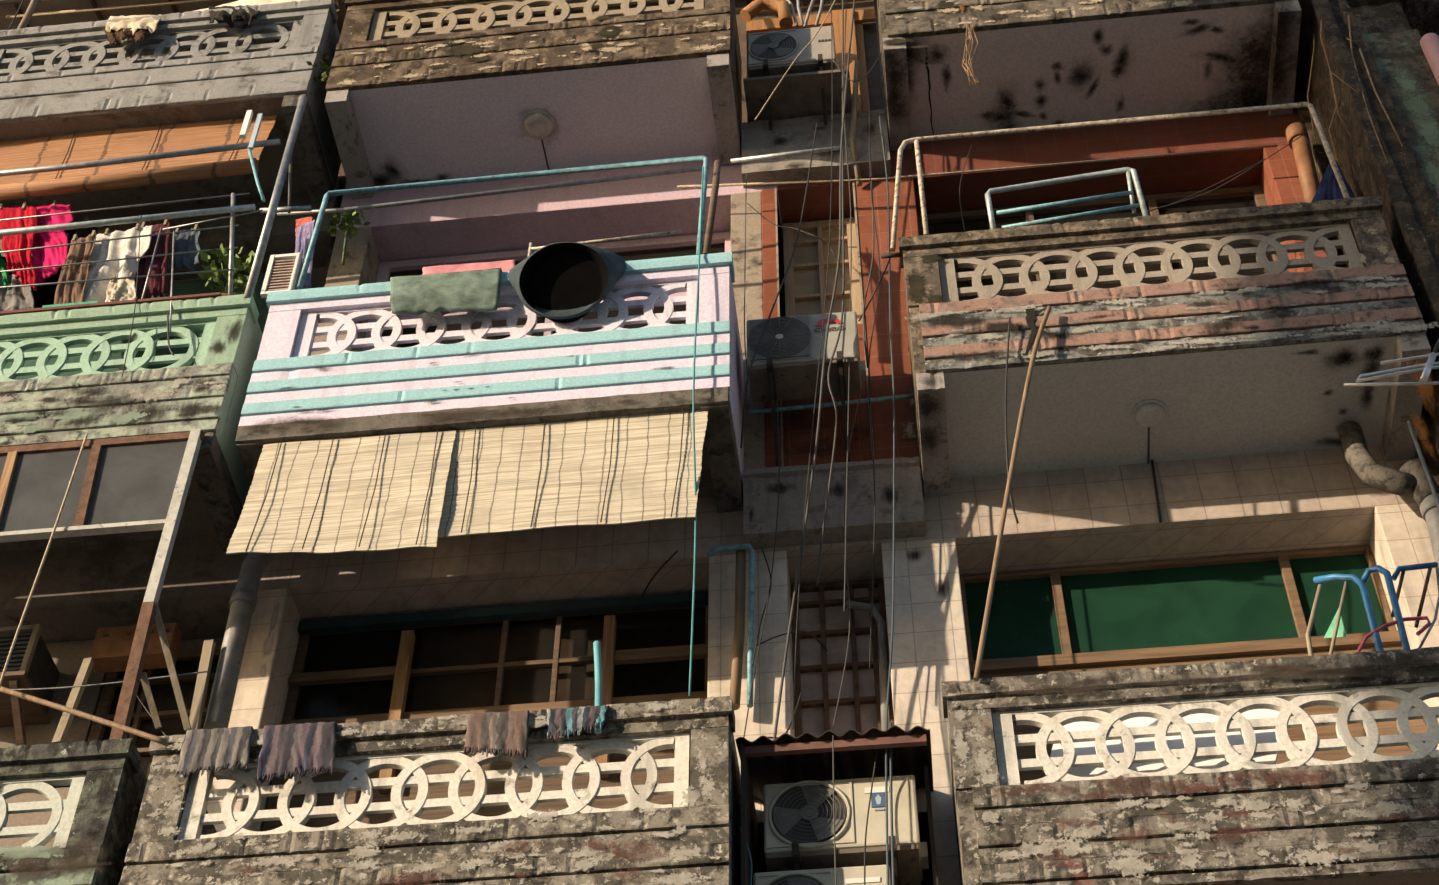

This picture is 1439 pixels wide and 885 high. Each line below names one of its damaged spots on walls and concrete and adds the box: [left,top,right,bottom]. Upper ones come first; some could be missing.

peeling [337,21,729,85]
damp [883,41,950,117]
damp [982,63,1096,129]
damp [1095,32,1127,75]
damp [1206,5,1311,110]
damp [1406,0,1439,37]
peeling [905,284,1439,359]
damp [1333,349,1382,402]
peeling [147,795,318,885]
peeling [406,807,721,885]
peeling [984,796,1315,880]
peeling [1256,781,1439,868]